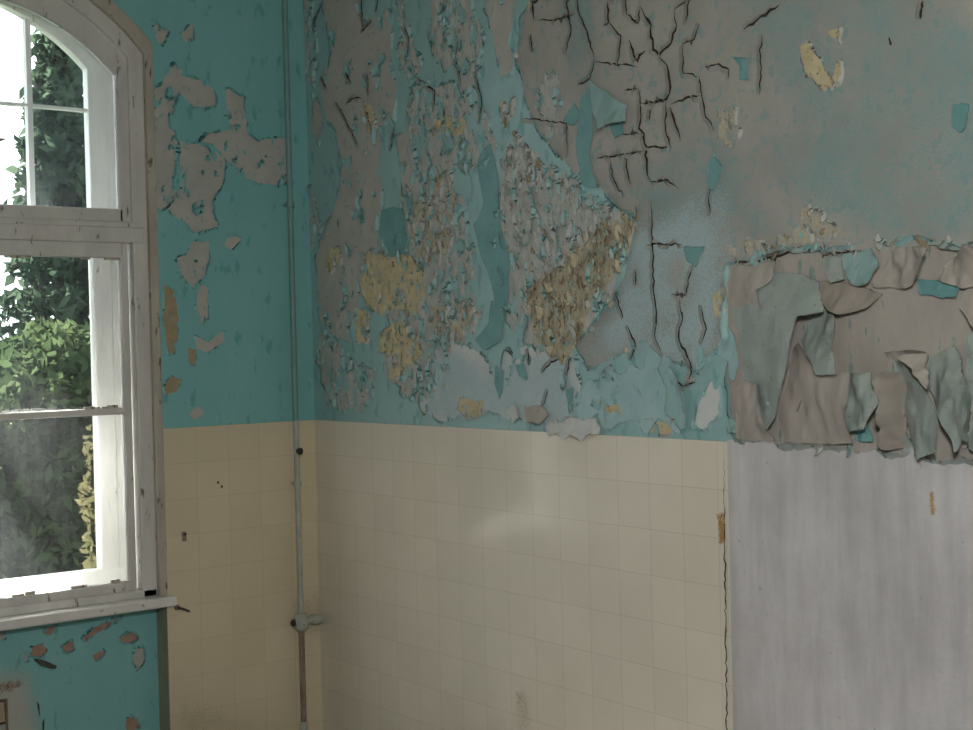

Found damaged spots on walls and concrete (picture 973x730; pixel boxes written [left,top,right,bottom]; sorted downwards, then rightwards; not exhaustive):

crack [743,1,779,95]
peeling [154,61,287,367]
crack [521,0,729,392]
peeling [303,0,973,467]
spalling [162,374,183,397]
spalling [22,626,57,669]
spalling [60,617,146,672]